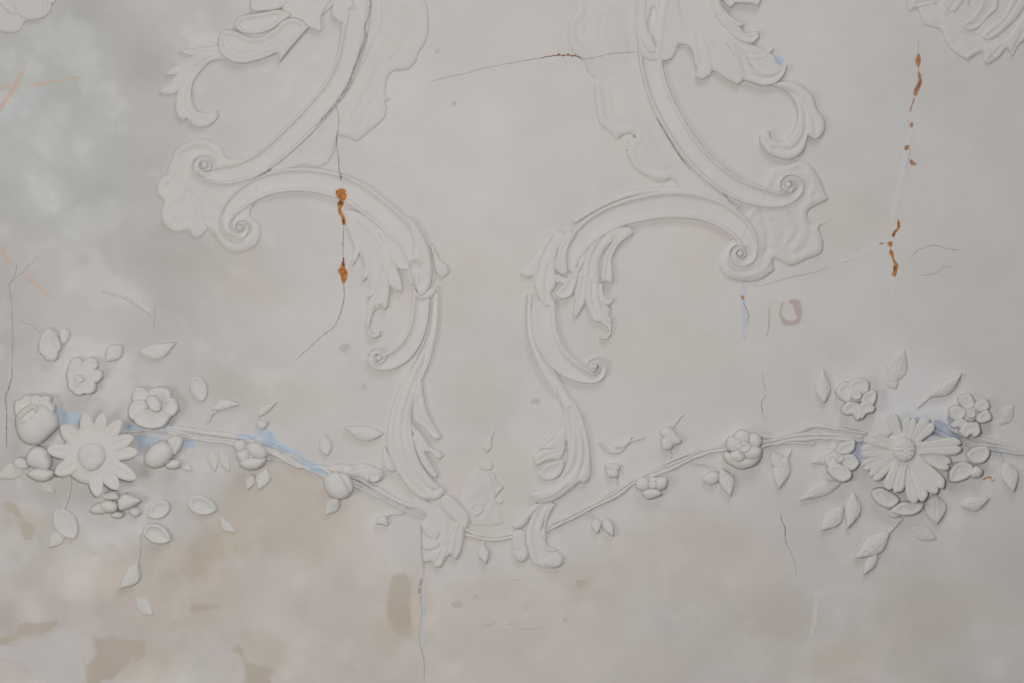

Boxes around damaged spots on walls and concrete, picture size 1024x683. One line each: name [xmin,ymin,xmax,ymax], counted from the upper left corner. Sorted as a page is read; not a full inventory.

crack [428,51,638,83]
rust [909,53,923,128]
rust [335,187,347,226]
rust [338,257,348,284]
rust [878,218,901,277]
crack [298,284,345,358]
leakage [778,298,803,327]
leakage [0,617,64,646]
leakage [84,631,151,683]
leakage [380,569,419,643]
crack [417,525,427,680]